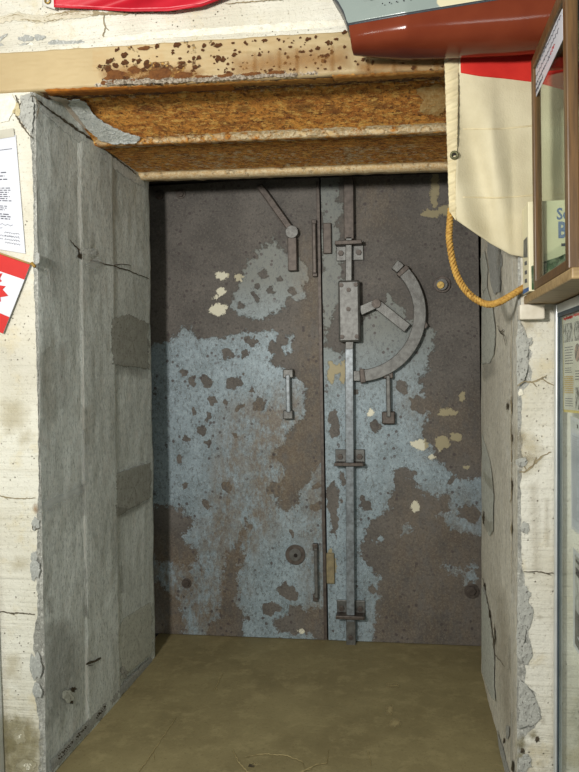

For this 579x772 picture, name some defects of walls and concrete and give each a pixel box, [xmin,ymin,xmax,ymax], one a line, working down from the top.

rust [45,30,446,116]
crack [70,240,149,279]
spalling [30,92,152,772]
spalling [497,320,542,772]
spalling [481,583,495,701]
crack [482,578,504,670]